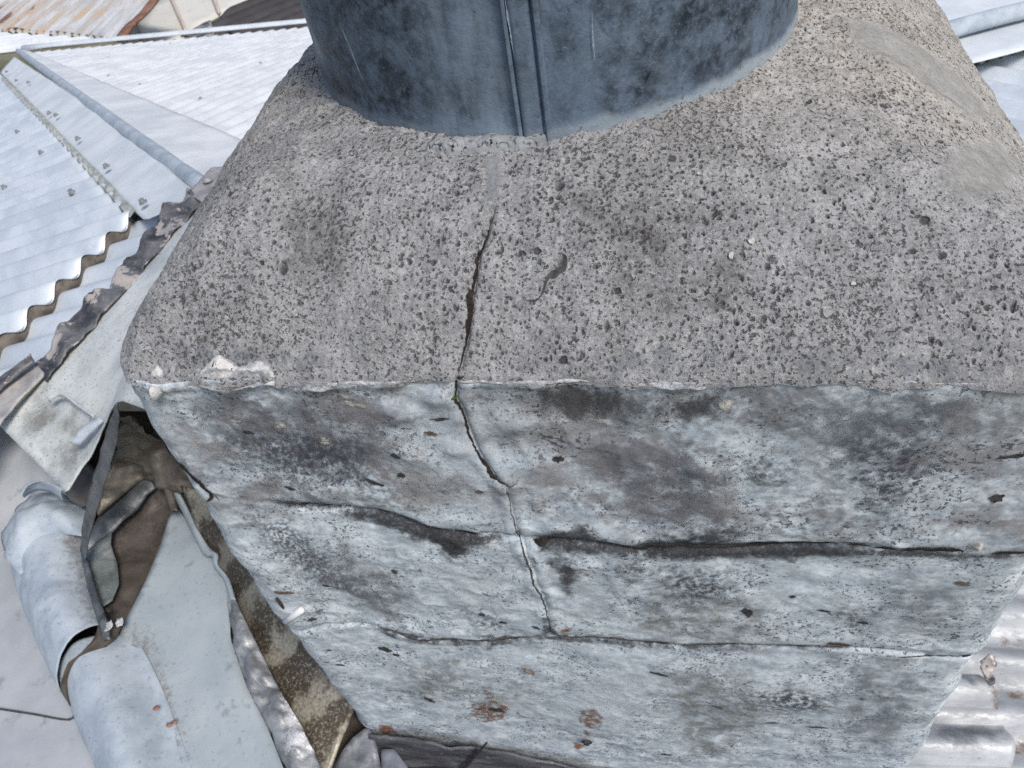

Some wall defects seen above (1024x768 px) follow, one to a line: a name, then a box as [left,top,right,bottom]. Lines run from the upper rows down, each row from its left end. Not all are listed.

crack [349,217,675,645]
crack [605,541,964,553]
crack [992,548,1024,556]
crack [900,652,955,660]
corrosion [471,687,507,722]
corrosion [575,709,601,749]